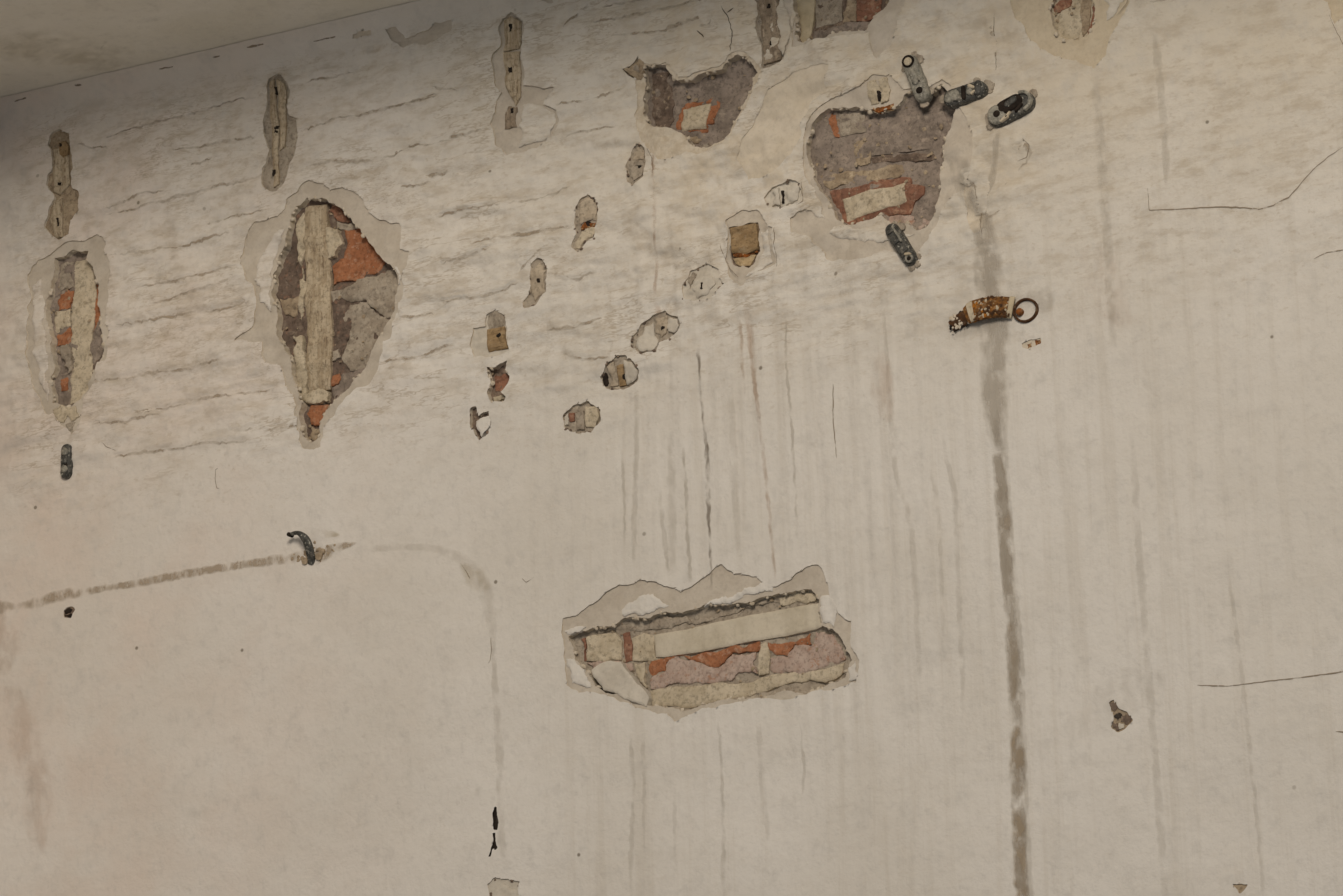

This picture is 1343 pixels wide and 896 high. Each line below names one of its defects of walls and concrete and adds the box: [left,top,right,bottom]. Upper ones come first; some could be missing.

spalling [627,0,908,177]
spalling [767,74,986,261]
spalling [1010,0,1130,68]
crack [1148,150,1338,211]
spalling [25,234,110,434]
spalling [234,180,409,450]
corrosion [949,295,1010,331]
leakage [984,320,1003,439]
leakage [89,557,282,592]
spalling [561,564,859,722]
leakage [994,456,1027,896]